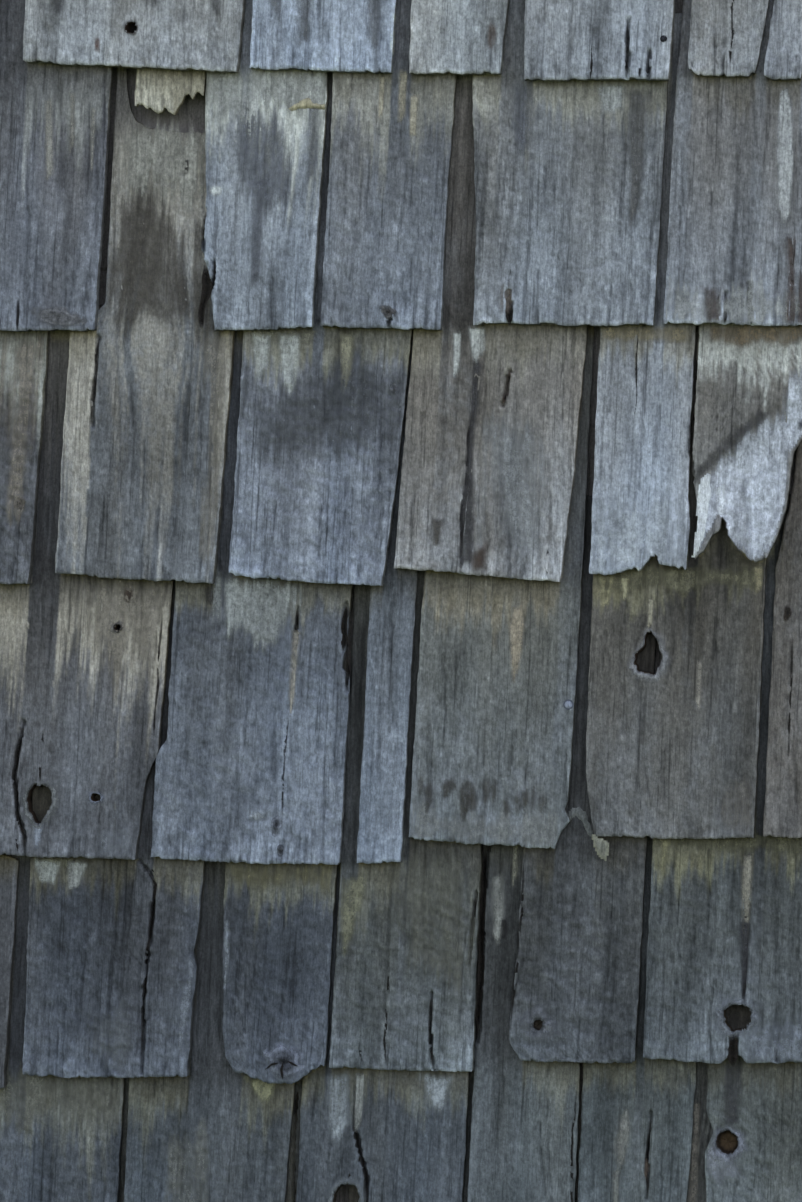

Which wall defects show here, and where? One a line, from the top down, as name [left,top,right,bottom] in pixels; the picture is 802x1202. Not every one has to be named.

water stain [110,193,220,342]
crack [12,732,44,850]
crack [349,1111,369,1202]